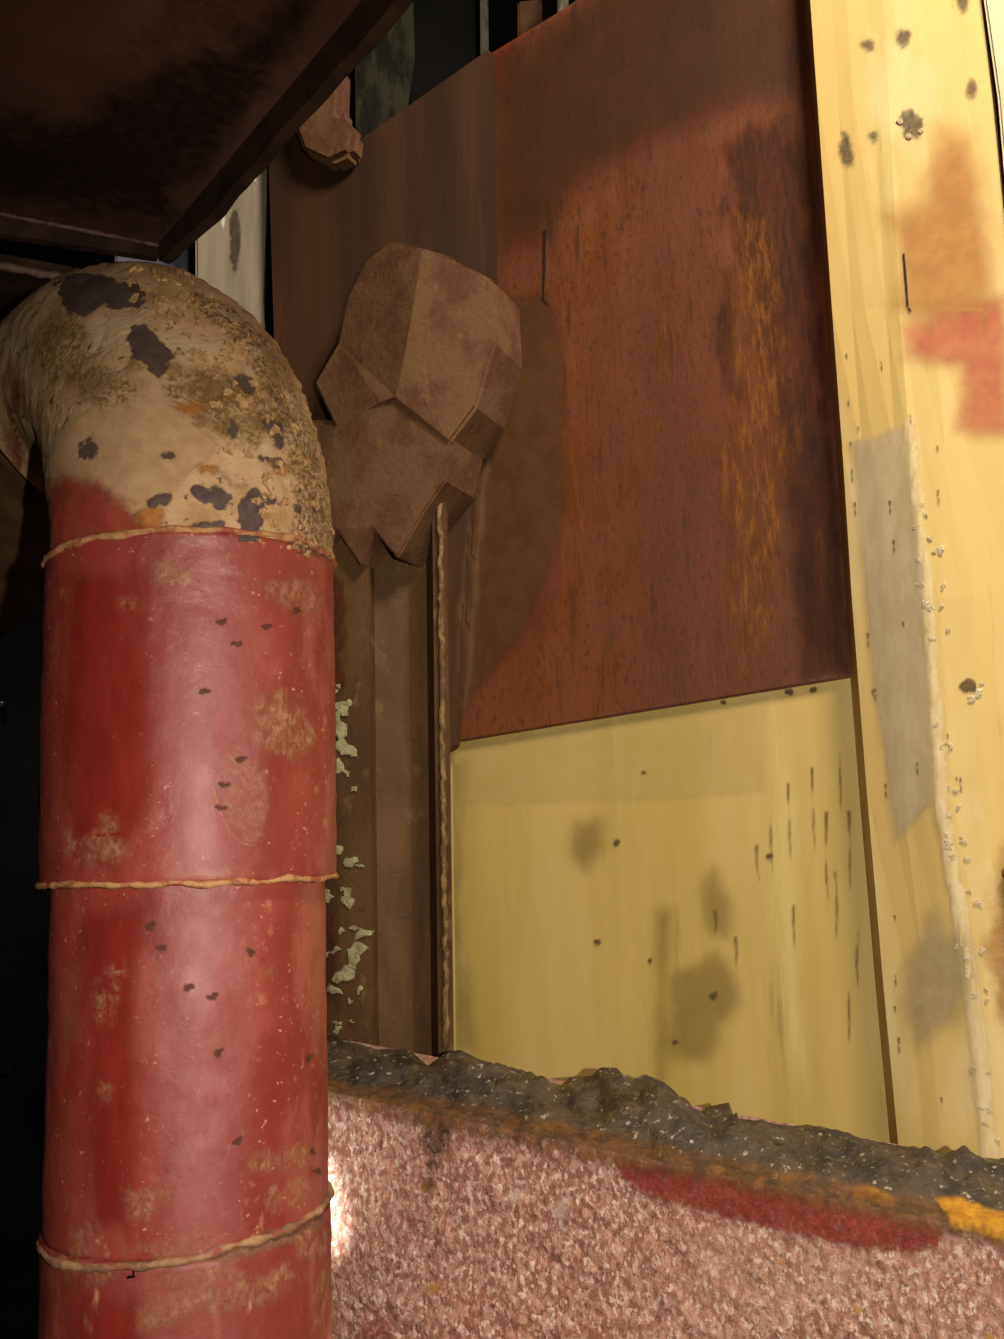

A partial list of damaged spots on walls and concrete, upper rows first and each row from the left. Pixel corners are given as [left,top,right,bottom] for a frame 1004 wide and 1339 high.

peeling [53,263,335,558]
peeling [335,684,358,791]
peeling [325,887,355,909]
peeling [336,845,364,868]
peeling [326,925,374,1035]
leakage [676,960,730,1054]